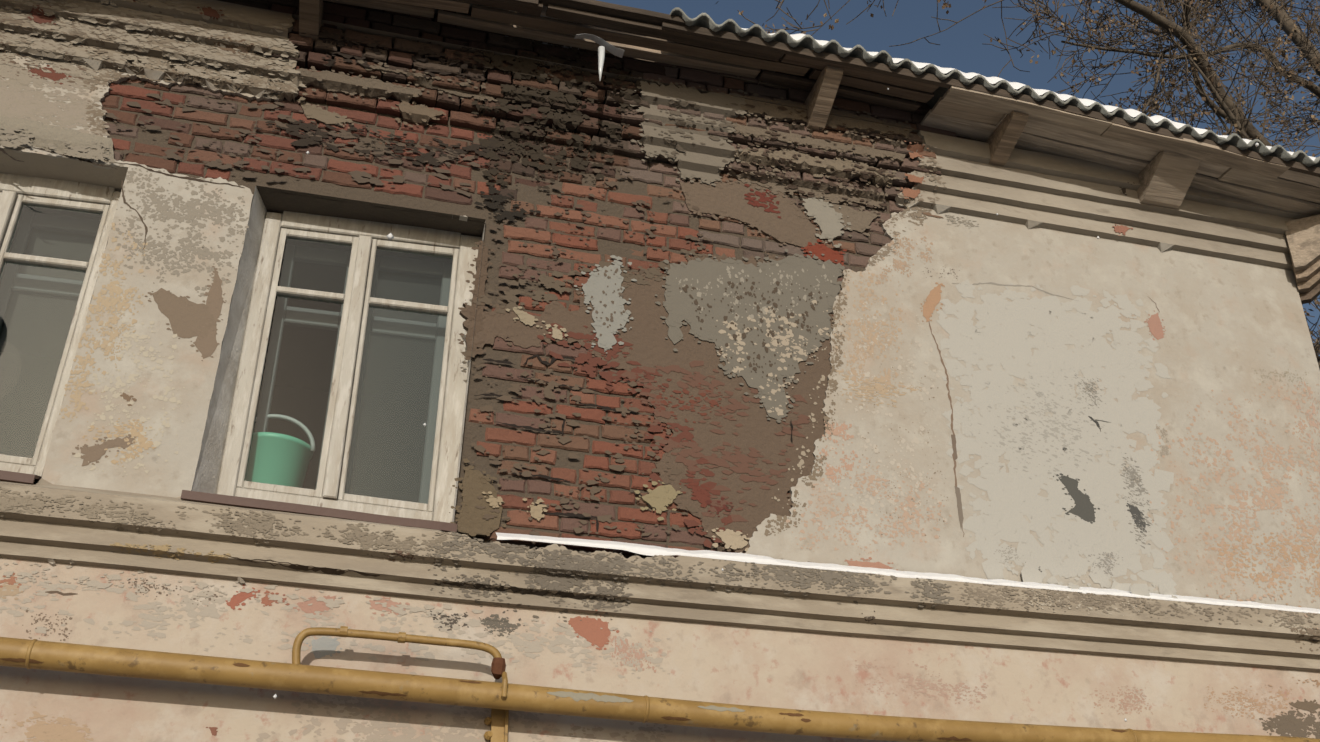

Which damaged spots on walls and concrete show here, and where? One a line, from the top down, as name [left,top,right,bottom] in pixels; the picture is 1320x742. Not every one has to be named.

spalling [0,2,94,105]
flaking render [101,0,956,558]
spalling [72,434,136,466]
crack [929,323,964,537]
spalling [568,610,619,650]
spalling [1286,699,1320,714]